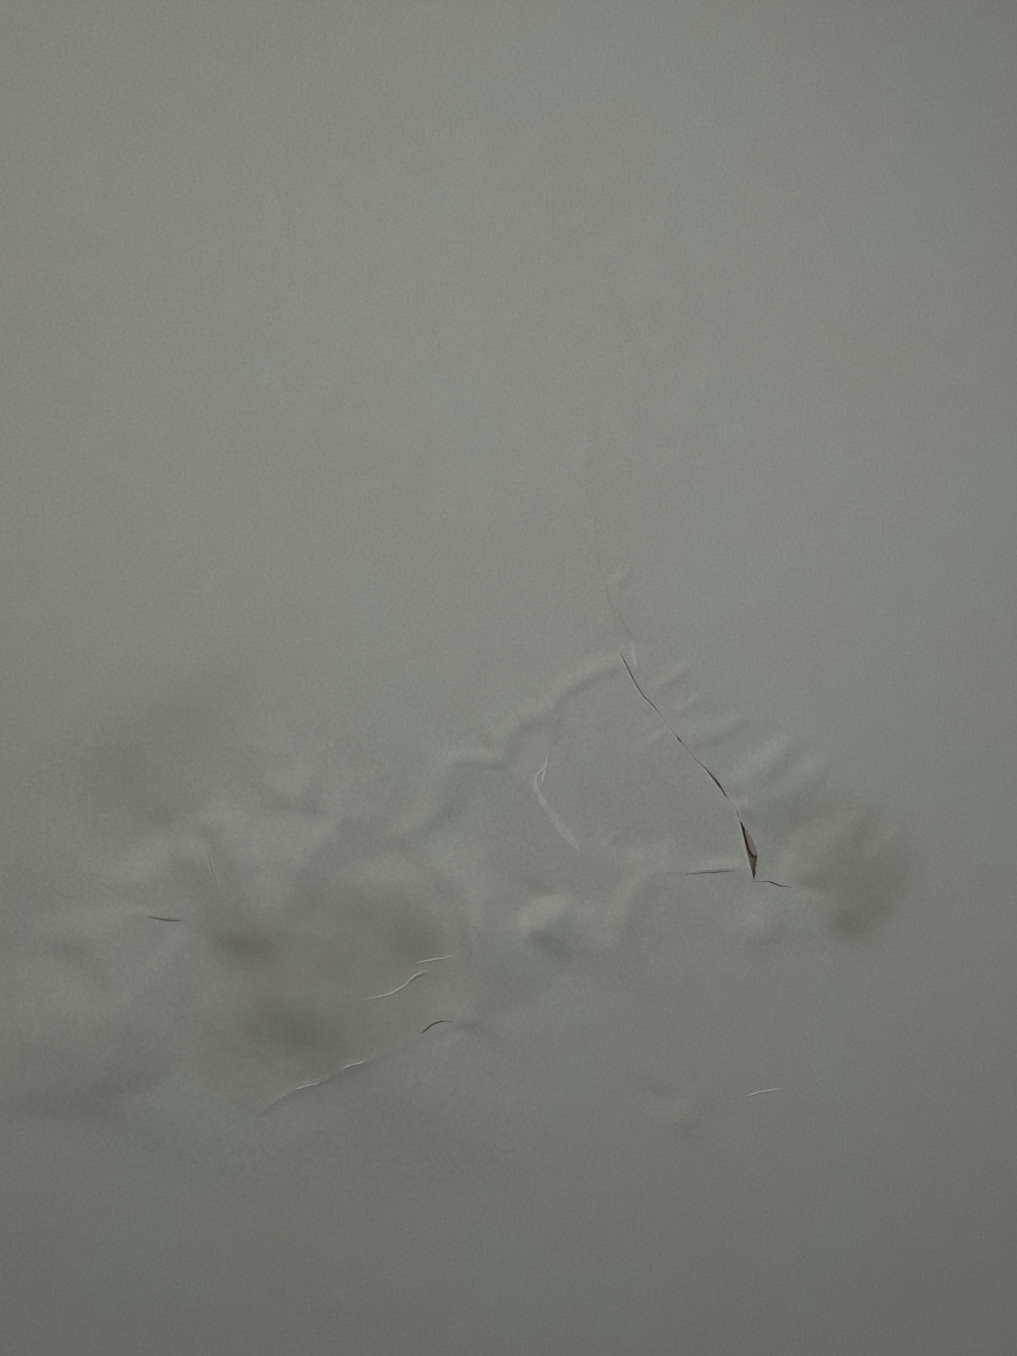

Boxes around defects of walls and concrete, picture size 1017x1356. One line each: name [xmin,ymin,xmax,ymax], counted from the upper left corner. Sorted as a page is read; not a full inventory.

crack [363,955,454,1000]